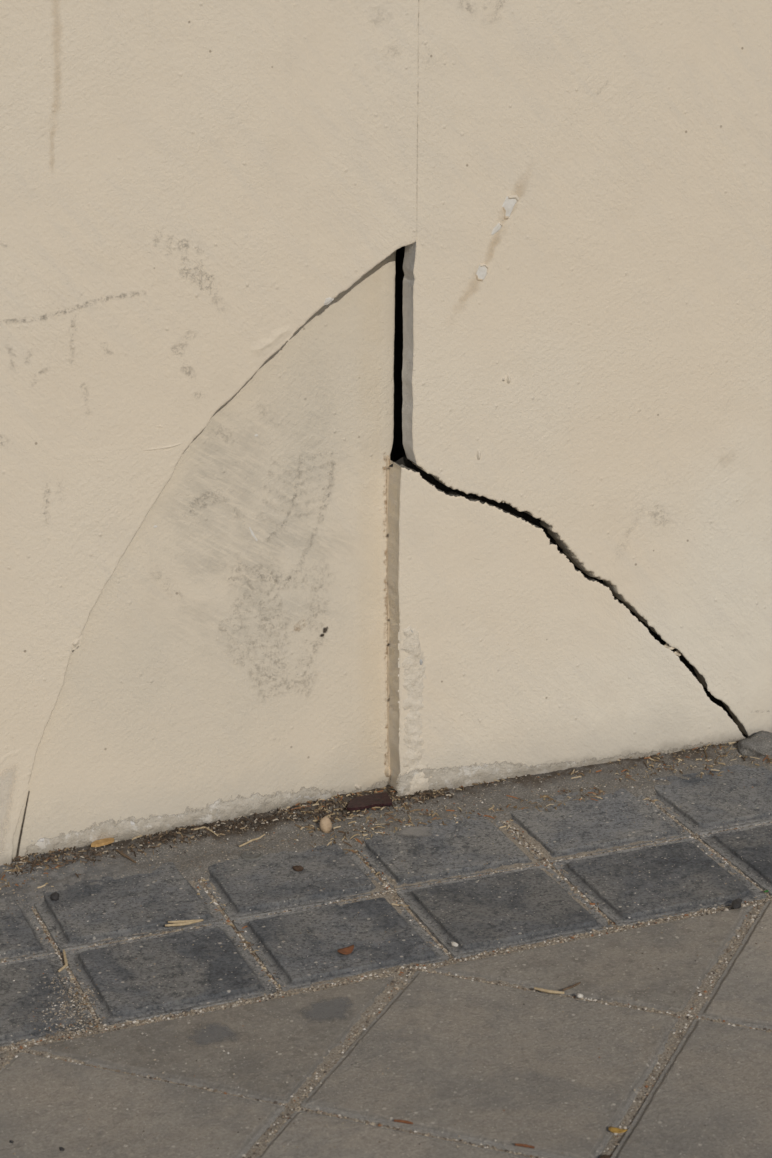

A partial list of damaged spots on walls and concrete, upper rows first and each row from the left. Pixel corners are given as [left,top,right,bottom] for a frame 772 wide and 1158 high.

crack [389,246,749,737]